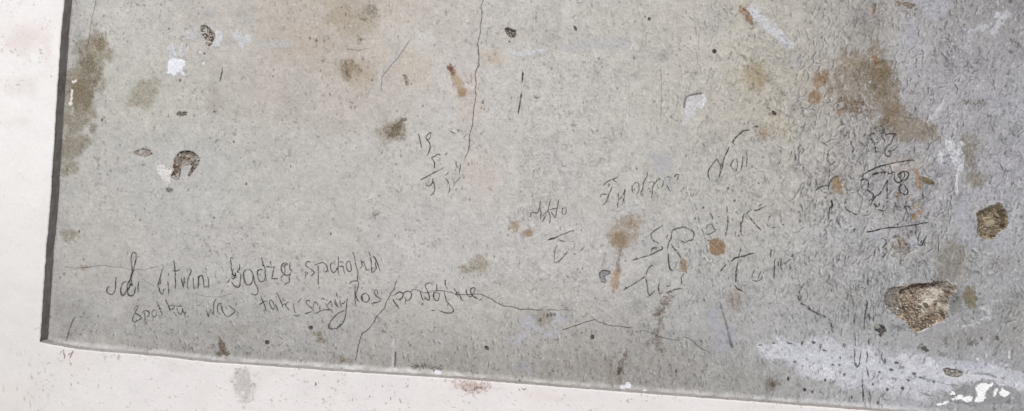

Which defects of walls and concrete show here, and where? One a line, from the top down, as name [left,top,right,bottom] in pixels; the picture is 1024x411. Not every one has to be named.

water stain [61,31,108,170]
water stain [827,41,940,141]
spalling [171,150,200,180]
spalling [976,202,1008,240]
crack [355,280,708,361]
spalling [884,281,958,334]